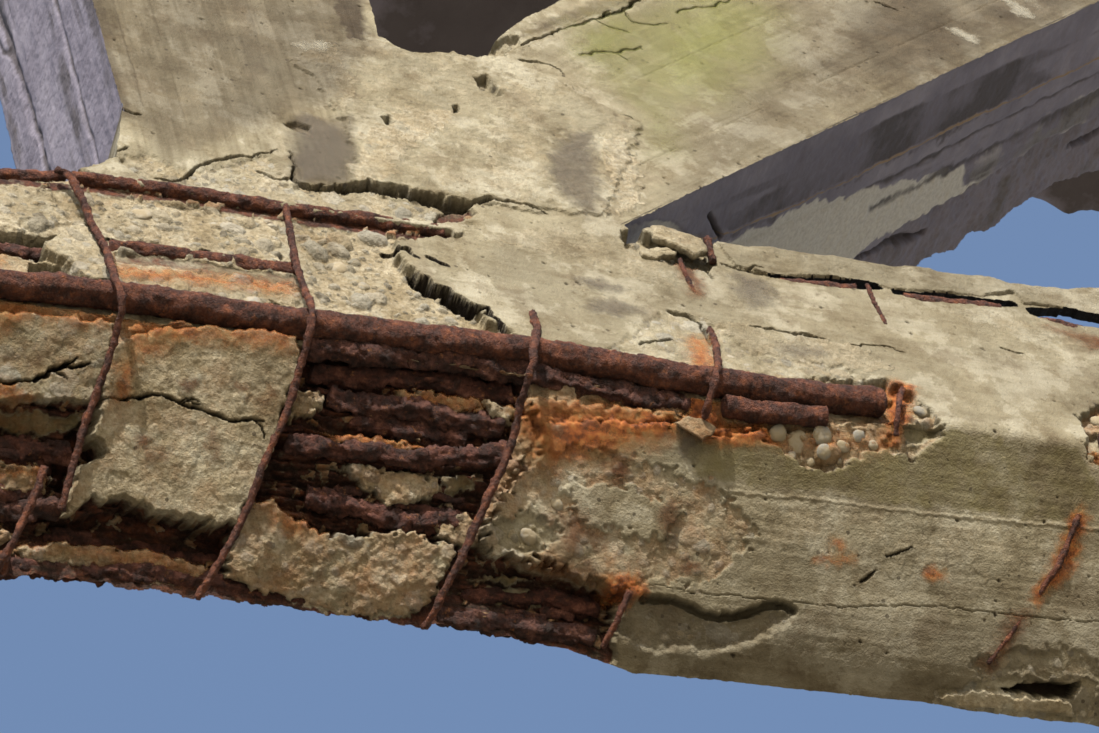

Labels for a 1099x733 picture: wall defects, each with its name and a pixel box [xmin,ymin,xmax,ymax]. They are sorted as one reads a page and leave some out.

crack [182,150,320,192]
spalling [0,179,509,334]
crack [410,253,506,334]
peeling [623,234,1099,324]
rust [130,323,287,348]
crack [2,358,92,386]
crack [102,396,266,440]
rust [331,435,424,449]
rust [521,398,780,460]
rust [878,381,914,447]
spalling [0,299,944,661]
spalling [932,674,1099,724]